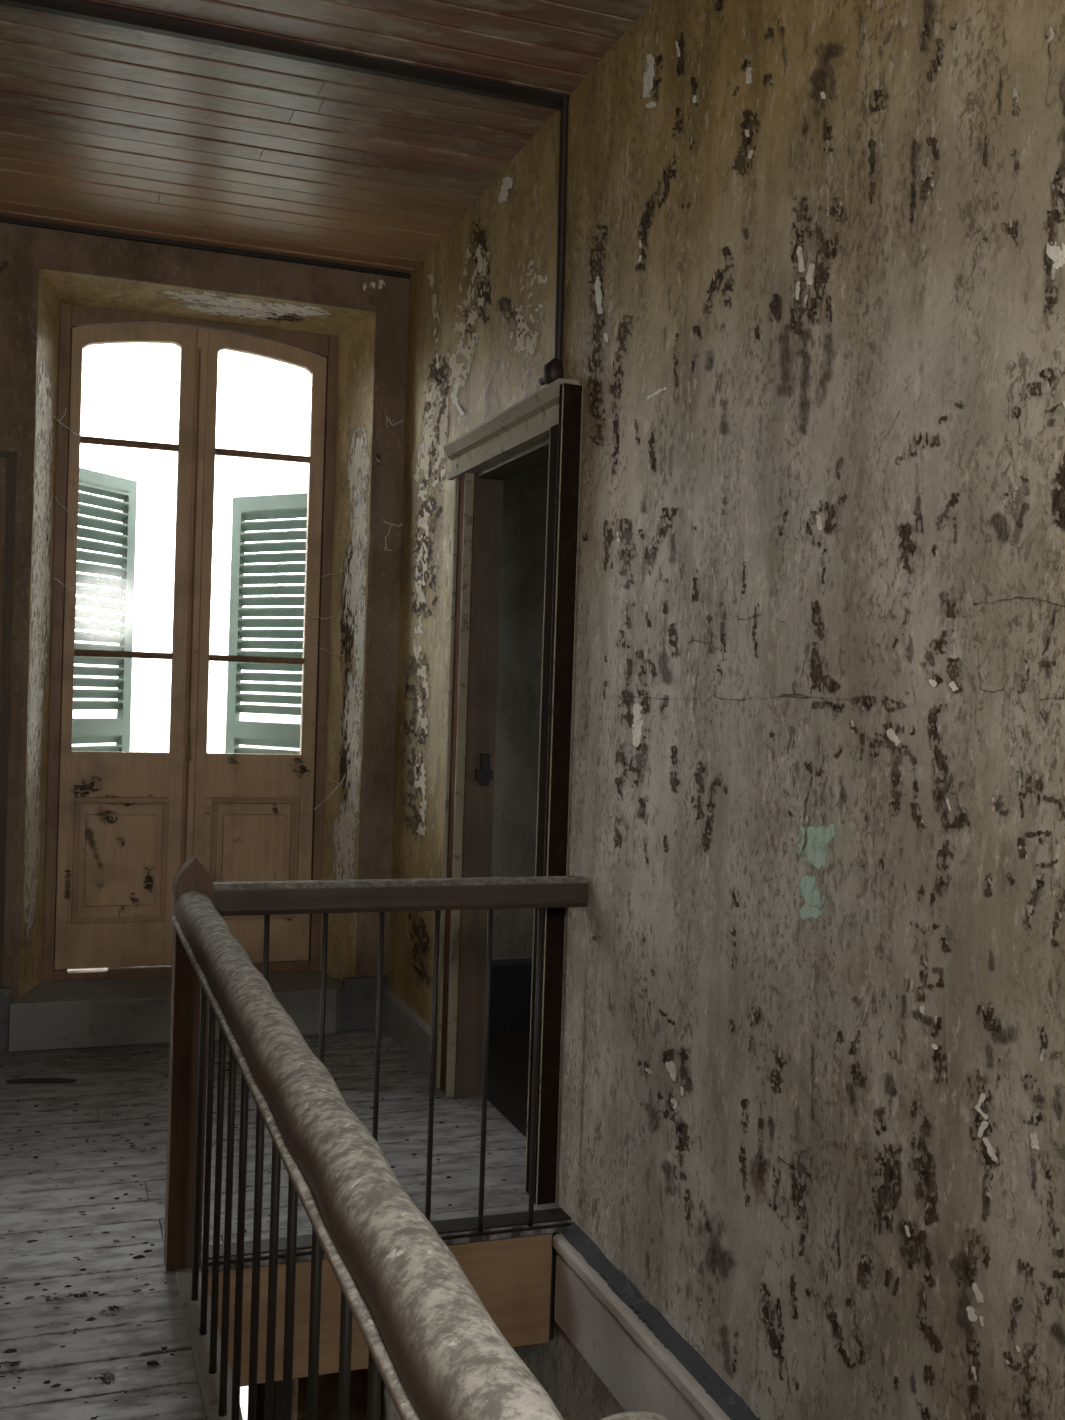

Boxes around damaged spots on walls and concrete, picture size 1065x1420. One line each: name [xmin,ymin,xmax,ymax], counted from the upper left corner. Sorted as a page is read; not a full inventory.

peeling [587,225,656,474]
spalling [754,197,847,340]
spalling [1043,104,1065,314]
peeling [333,425,380,880]
peeling [402,218,549,838]
peeling [850,593,970,905]
peeling [898,488,960,574]
peeling [992,771,1065,930]
spalling [1052,454,1065,531]
spalling [638,1009,693,1220]
peeling [825,1101,943,1420]
spalling [951,1003,1013,1420]